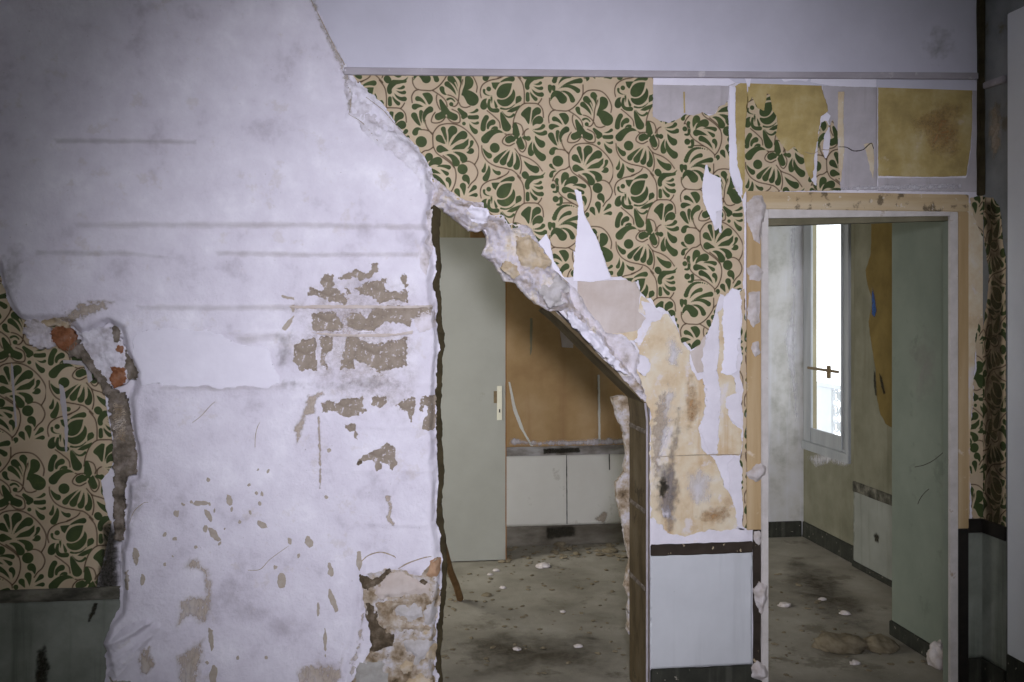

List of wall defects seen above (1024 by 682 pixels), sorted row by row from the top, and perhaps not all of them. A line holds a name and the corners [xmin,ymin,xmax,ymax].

flaking render [293,263,436,373]
spalling [342,64,647,635]
spalling [22,318,145,590]
flaking render [321,395,437,440]
damp [652,394,676,512]
flaking render [205,628,218,682]
flaking render [274,565,286,588]
flaking render [288,536,313,558]
flaking render [317,563,338,616]
spalling [352,551,441,682]